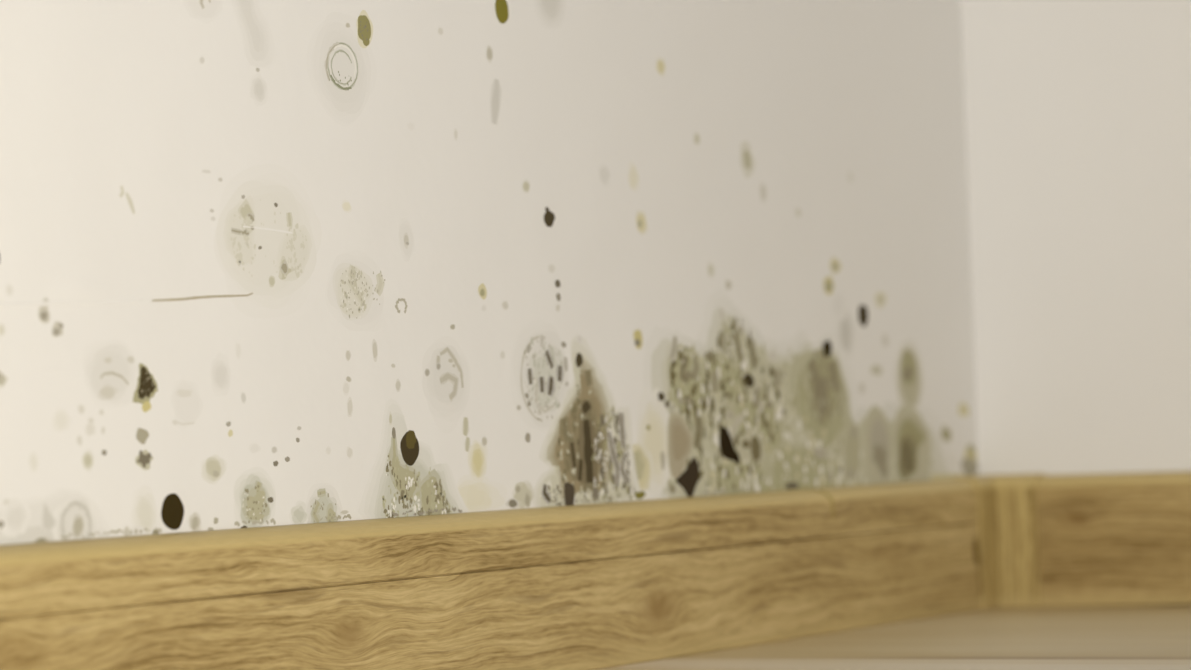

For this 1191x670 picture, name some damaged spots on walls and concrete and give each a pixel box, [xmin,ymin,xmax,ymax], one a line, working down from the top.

leakage [201,164,322,319]
mould [544,207,555,227]
mould [38,298,63,337]
crack [150,293,253,302]
mould [51,339,246,472]
leakage [289,250,979,525]
leakage [0,485,218,545]
mould [201,443,290,528]